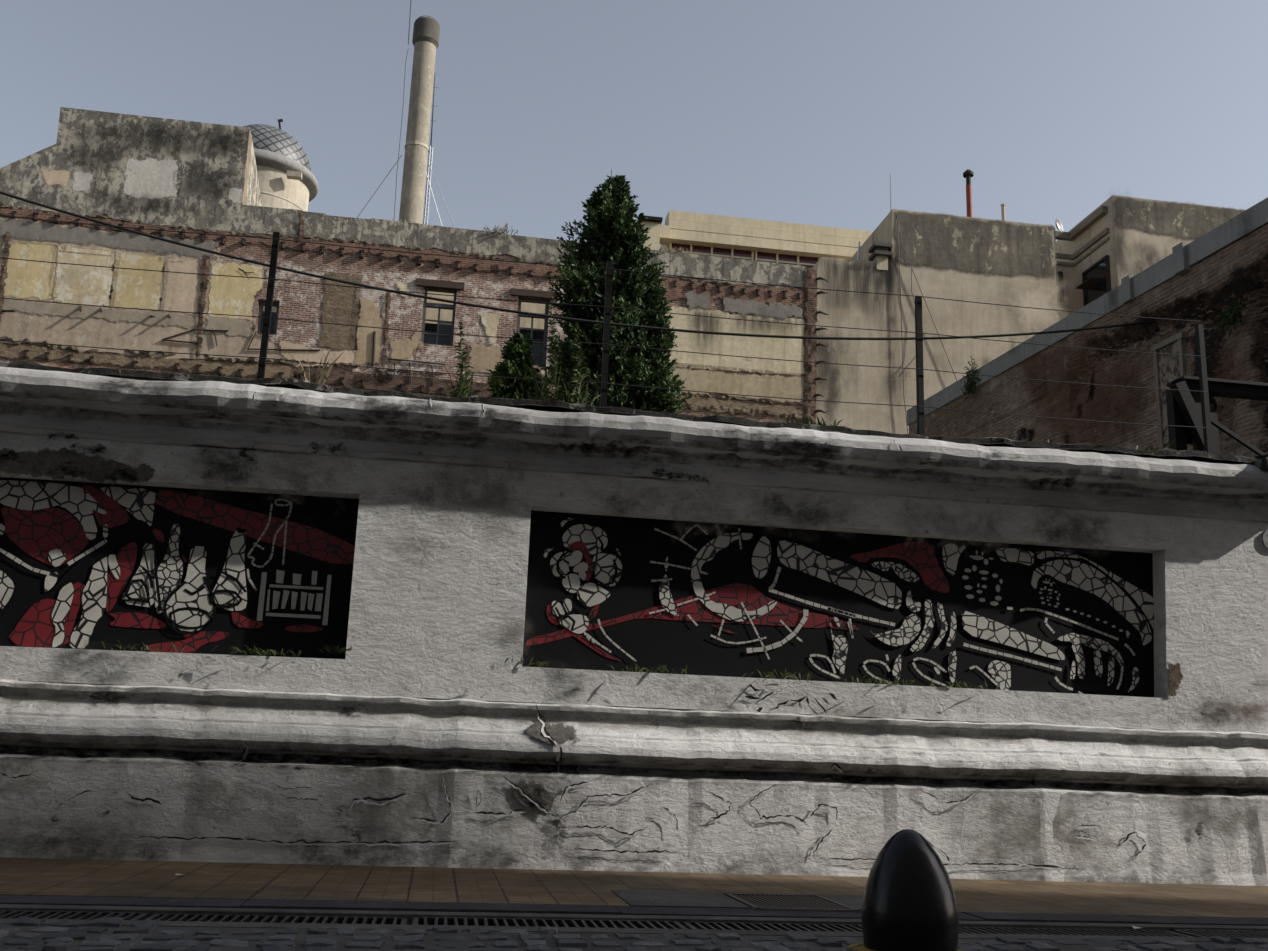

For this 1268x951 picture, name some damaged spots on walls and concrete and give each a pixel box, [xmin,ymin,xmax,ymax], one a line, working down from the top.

damp [73,126,243,193]
flaking render [0,207,567,277]
peeling [0,447,155,486]
spalling [524,720,580,745]
crack [127,705,680,856]
crack [710,764,875,862]
crack [922,790,974,806]
crack [928,841,1086,872]
crack [1076,824,1148,861]